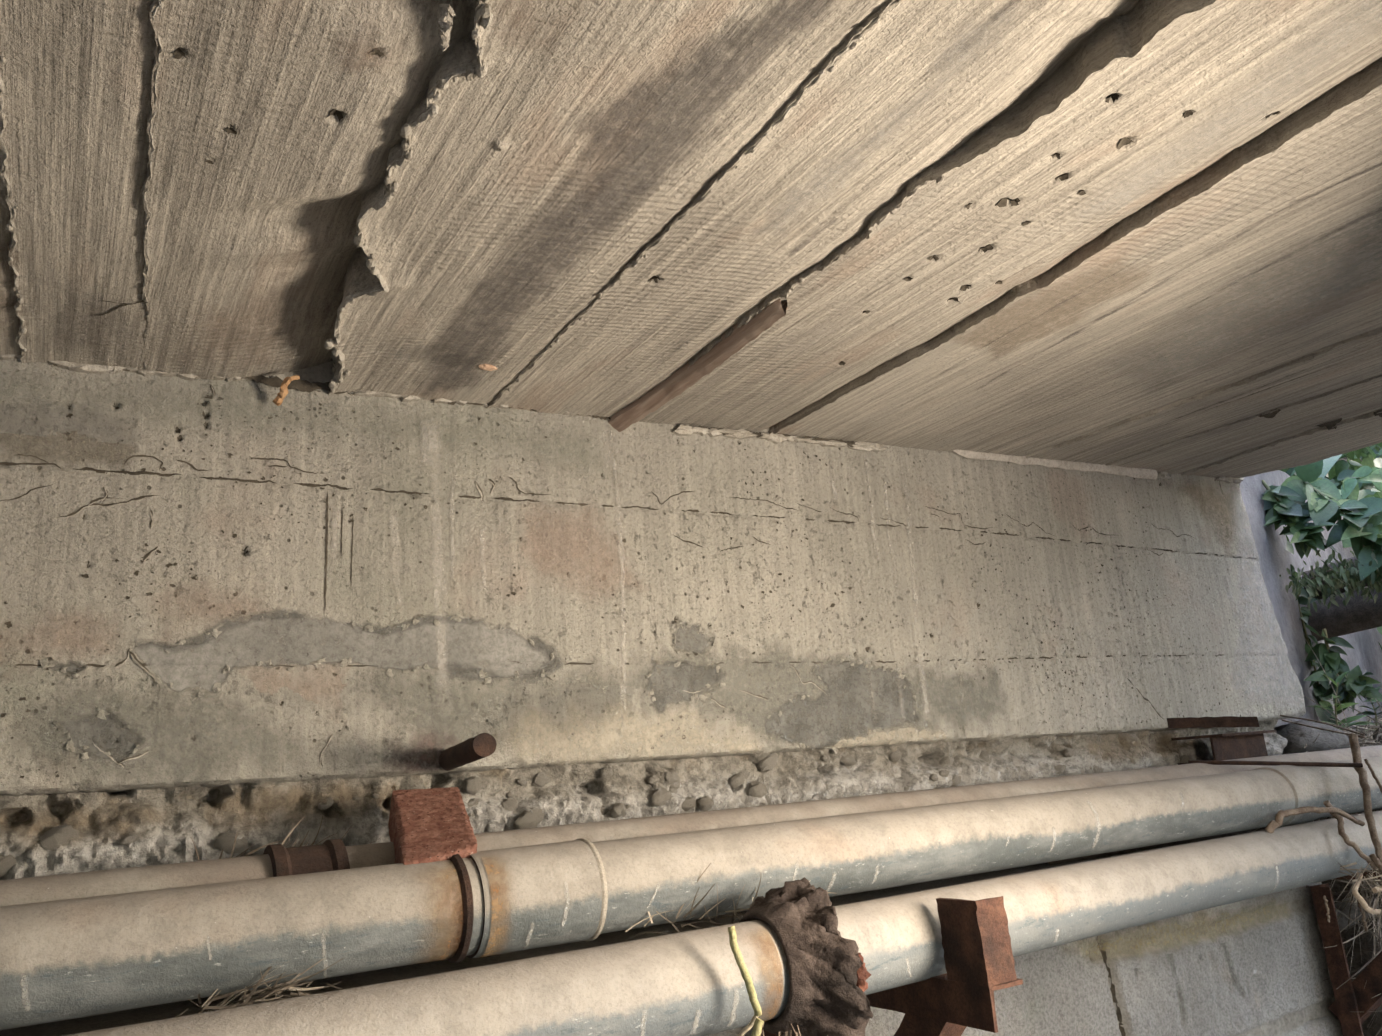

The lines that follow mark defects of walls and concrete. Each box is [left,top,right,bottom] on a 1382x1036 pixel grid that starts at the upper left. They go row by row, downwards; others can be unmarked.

peeling [400,124,412,160]
leakage [431,0,820,389]
peeling [354,229,377,274]
crack [0,454,209,562]
crack [251,457,354,608]
crack [475,477,548,503]
crack [651,491,694,505]
crack [674,535,770,551]
crack [731,497,1196,556]
peeling [135,611,562,697]
leakage [876,670,998,731]
peeling [53,708,143,760]